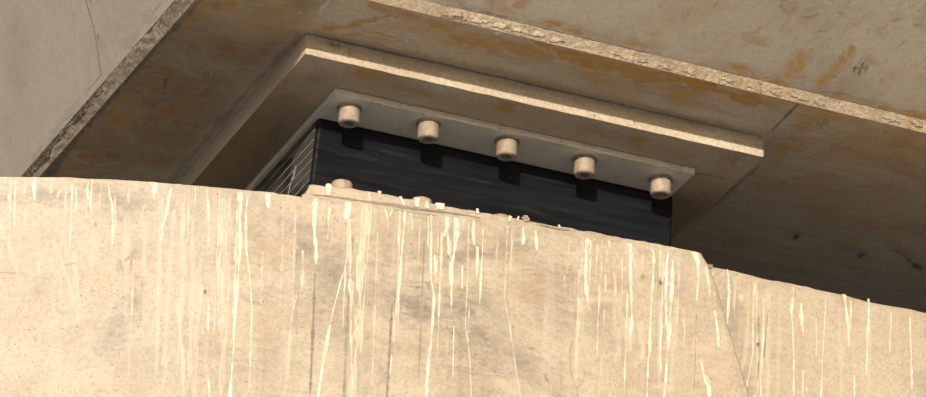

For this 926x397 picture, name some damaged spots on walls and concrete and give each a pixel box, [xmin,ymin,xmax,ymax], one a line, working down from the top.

rust [42,112,164,181]
rust [192,64,441,190]
leakage [0,0,712,397]
rust [321,0,926,189]
leakage [692,252,807,397]
leakage [836,294,872,397]
leakage [889,311,926,397]